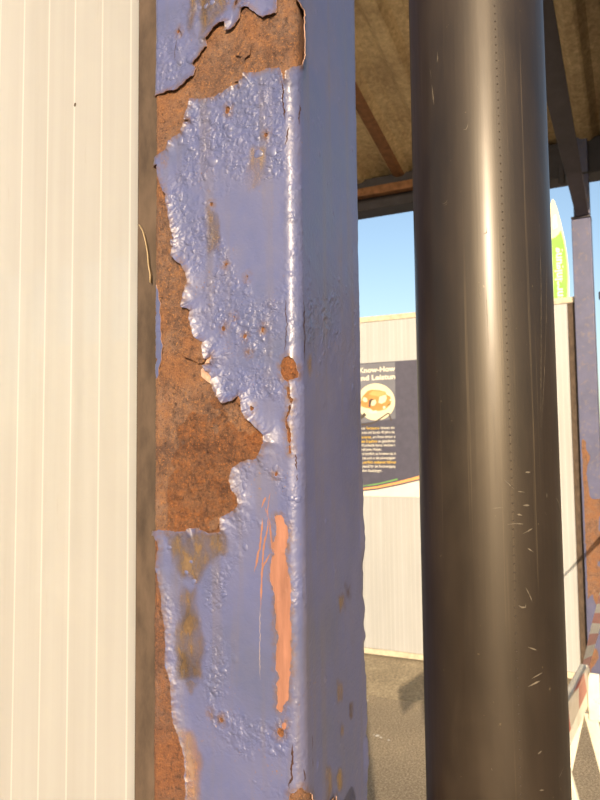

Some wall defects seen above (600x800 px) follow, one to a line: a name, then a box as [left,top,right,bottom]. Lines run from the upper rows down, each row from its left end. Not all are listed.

peeling [156,0,302,155]
peeling [138,168,263,533]
peeling [281,356,298,454]
corrosion [171,535,224,582]
peeling [154,541,186,800]
corrosion [177,591,201,682]
peeling [289,788,312,800]